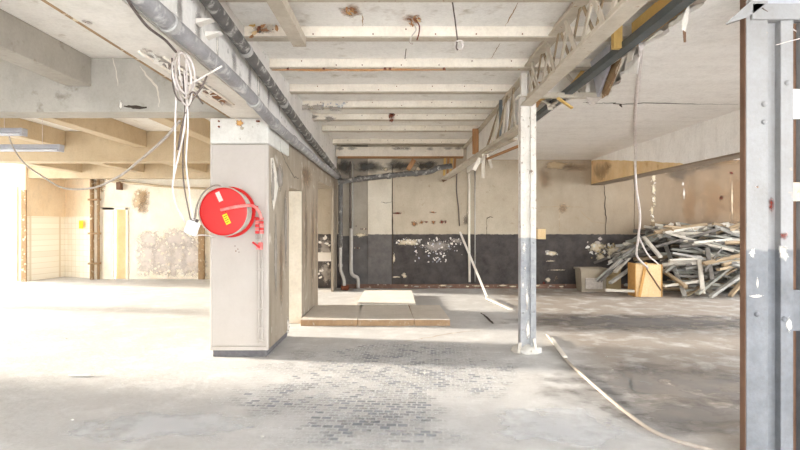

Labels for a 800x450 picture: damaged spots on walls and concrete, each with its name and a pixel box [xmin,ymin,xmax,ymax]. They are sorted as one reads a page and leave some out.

crack [554,186,607,234]
peeling [138,229,198,279]
peeling [396,237,461,263]